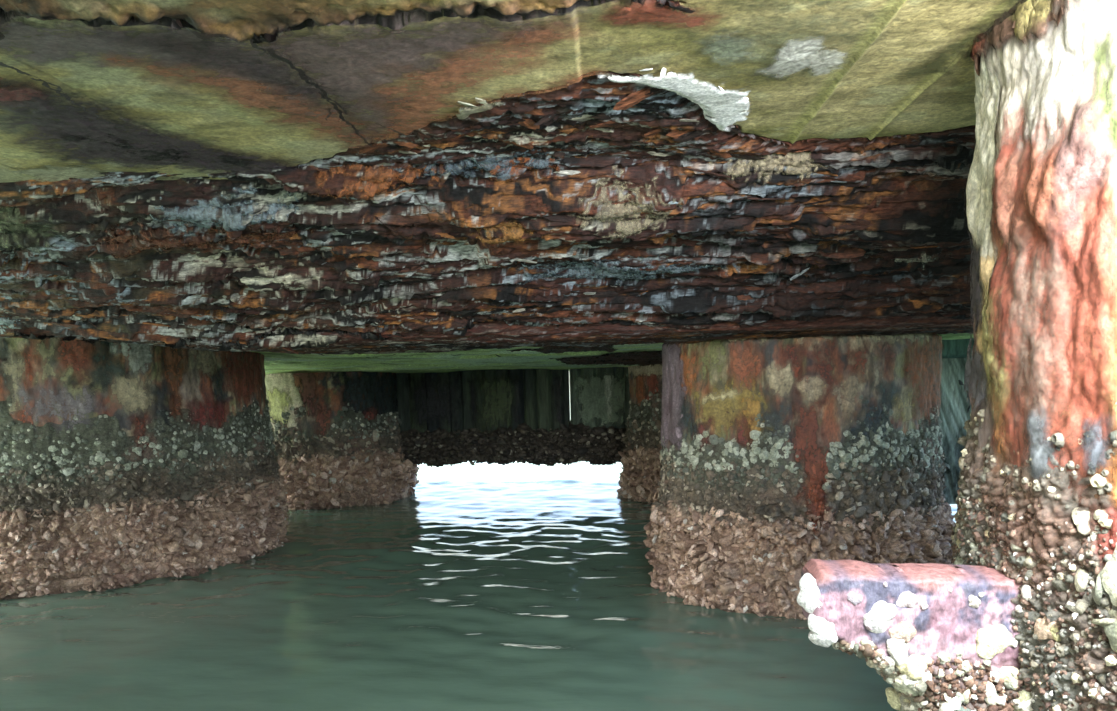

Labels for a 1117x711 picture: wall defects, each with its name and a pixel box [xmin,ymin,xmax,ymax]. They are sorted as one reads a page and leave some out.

crack [632,0,695,13]
crack [175,18,418,147]
spalling [0,68,976,179]
damp [19,166,105,182]
corrosion [311,163,445,200]
corrosion [478,156,560,182]
corrosion [469,220,533,245]
corrosion [983,106,1117,568]
corrosion [158,346,226,428]
corrosion [222,351,262,401]
corrosion [680,345,774,447]